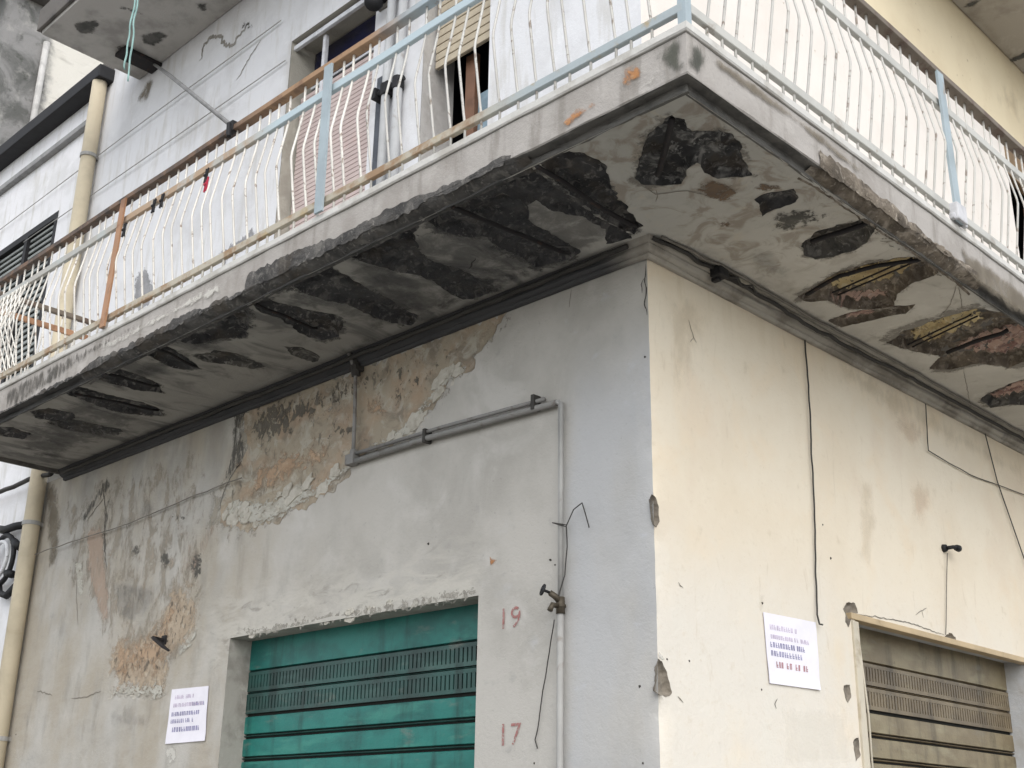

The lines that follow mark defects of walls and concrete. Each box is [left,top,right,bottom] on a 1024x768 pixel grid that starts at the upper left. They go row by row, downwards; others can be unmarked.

spalling [629,114,757,189]
spalling [0,151,643,435]
spalling [754,150,1024,408]
spalling [0,427,31,439]
peeling [206,312,507,533]
leakage [48,487,59,563]
leakage [84,480,110,552]
flaking render [649,494,660,527]
peeling [71,461,203,700]
mould [191,554,202,577]
flaking render [639,653,672,697]